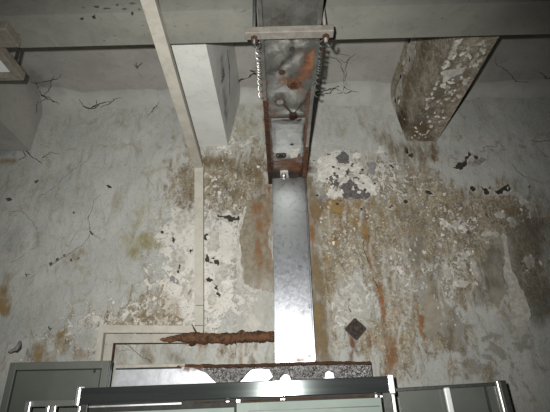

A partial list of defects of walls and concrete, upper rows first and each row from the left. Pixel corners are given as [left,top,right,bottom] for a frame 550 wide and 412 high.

peeling [391,38,418,120]
peeling [411,38,487,139]
spalling [204,162,274,308]
water stain [240,306,263,332]
rust [177,176,371,370]
peeling [313,145,537,329]
water stain [499,233,550,334]